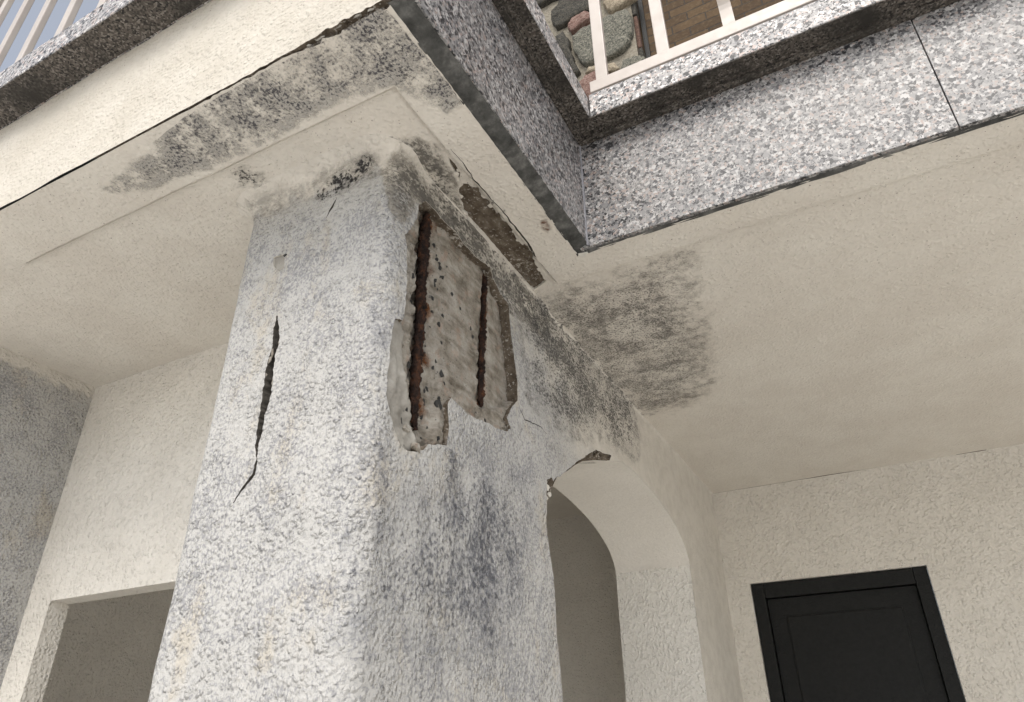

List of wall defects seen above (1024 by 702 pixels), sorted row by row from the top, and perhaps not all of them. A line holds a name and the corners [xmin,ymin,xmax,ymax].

crack [233,316,280,503]
spalling [386,201,518,453]
damp [317,137,713,445]